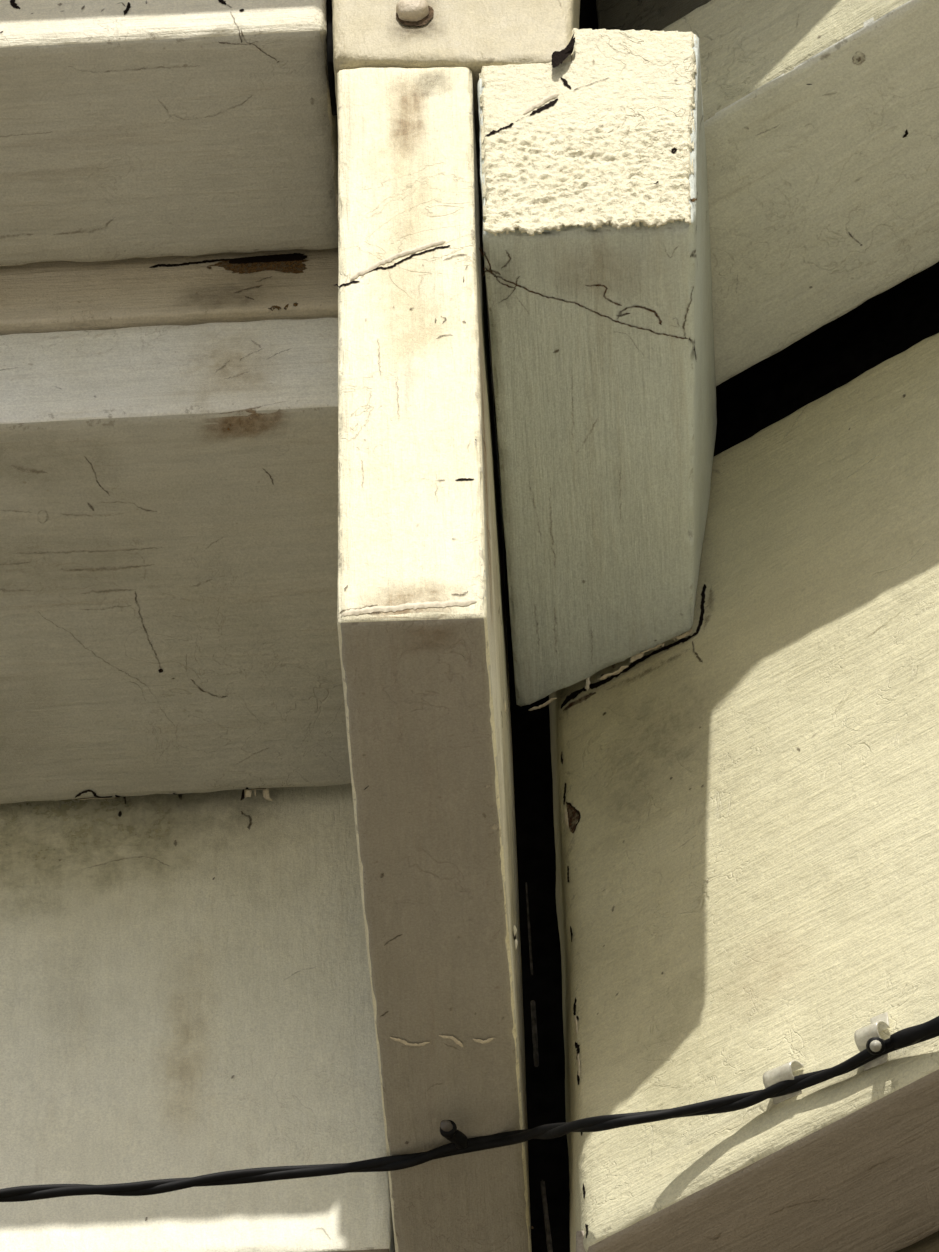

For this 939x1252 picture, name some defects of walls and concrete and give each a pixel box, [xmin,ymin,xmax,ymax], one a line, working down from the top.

spalling [551,32,575,89]
crack [334,192,707,358]
crack [135,593,226,698]